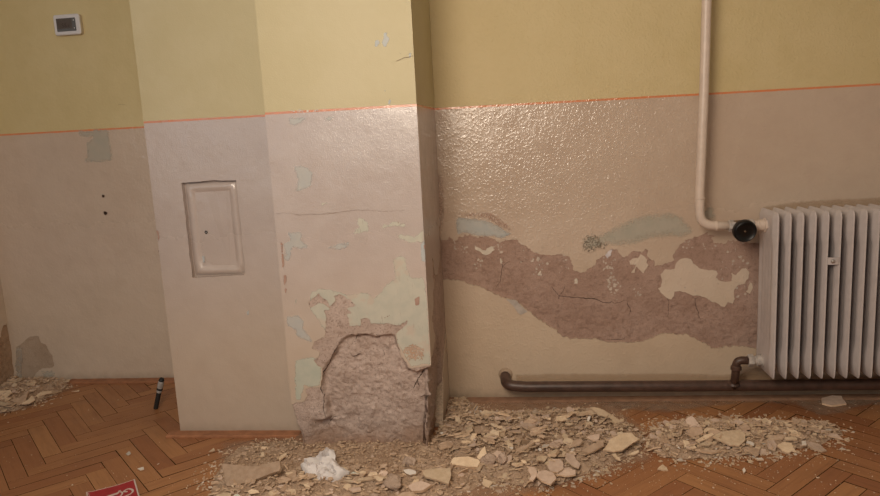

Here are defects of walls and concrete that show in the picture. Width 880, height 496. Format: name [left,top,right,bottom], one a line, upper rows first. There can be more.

flaking render [0,324,54,385]
flaking render [293,230,759,447]